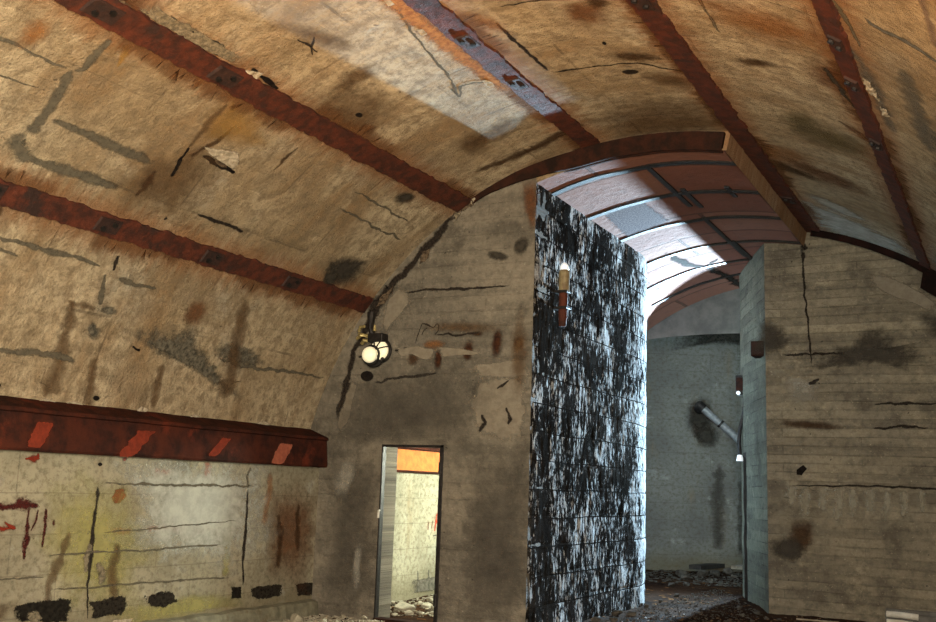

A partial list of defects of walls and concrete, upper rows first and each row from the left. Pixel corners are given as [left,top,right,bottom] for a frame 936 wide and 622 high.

crack [496,0,679,72]
crack [0,37,150,189]
leakage [899,73,936,149]
leakage [44,305,74,393]
leakage [88,323,99,339]
leakage [132,303,323,406]
crack [336,192,505,416]
leakage [756,323,783,351]
crack [785,244,843,362]
leakage [819,331,916,368]
crack [874,401,936,430]
crack [794,483,936,491]